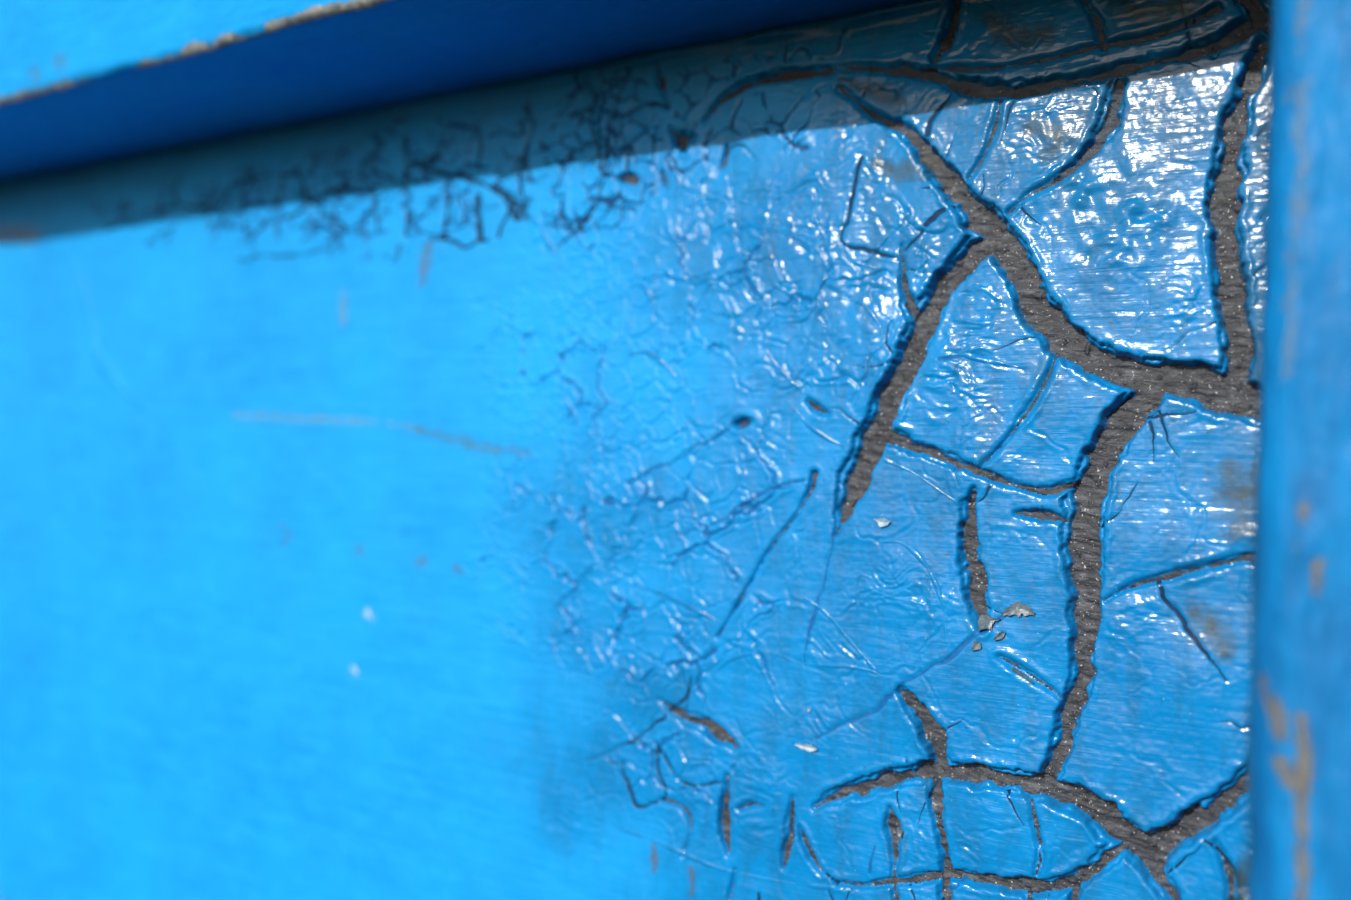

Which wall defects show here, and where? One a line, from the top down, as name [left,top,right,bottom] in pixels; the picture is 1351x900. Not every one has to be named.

peeling [0,77,102,105]
peeling [119,0,390,72]
crack [78,55,742,264]
crack [644,0,1272,900]
crack [509,316,818,853]